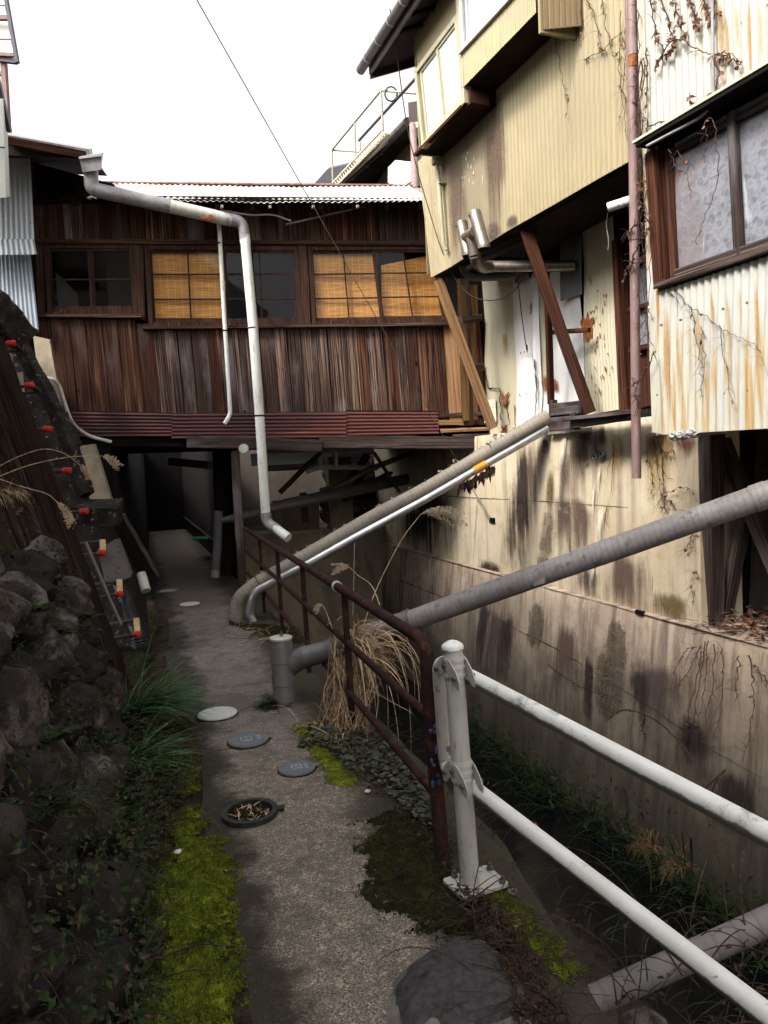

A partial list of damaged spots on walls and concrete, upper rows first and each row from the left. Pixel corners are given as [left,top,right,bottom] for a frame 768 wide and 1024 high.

rust [718,5,761,70]
leakage [486,109,504,208]
leakage [450,164,464,243]
rust [580,311,594,342]
rust [656,289,700,406]
rust [726,294,741,350]
leakage [509,426,605,557]
leakage [476,606,513,670]
leakage [612,559,641,607]
leakage [653,594,685,621]
leakage [551,626,593,717]
leakage [631,664,677,721]